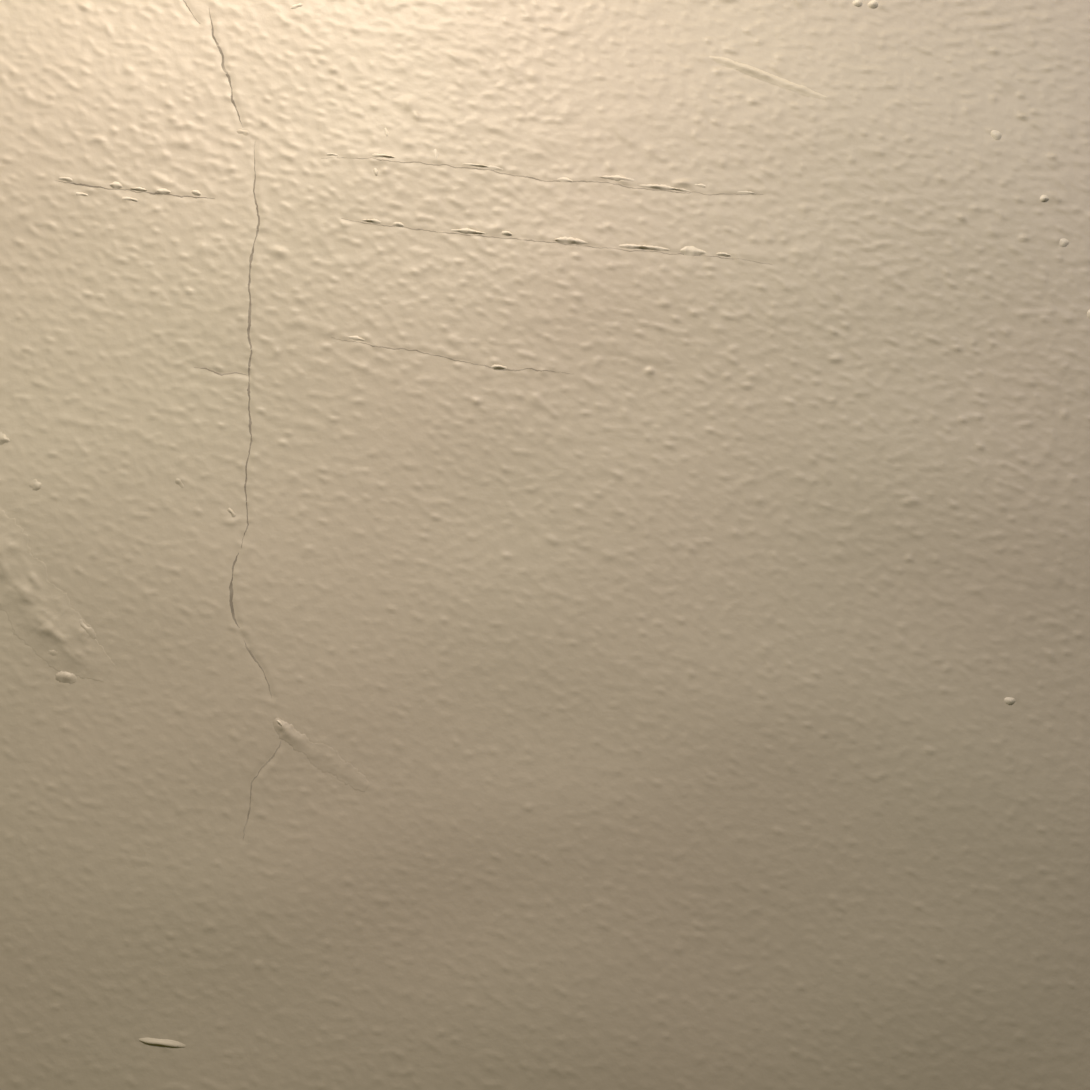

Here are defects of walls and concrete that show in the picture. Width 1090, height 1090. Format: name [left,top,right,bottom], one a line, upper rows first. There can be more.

crack [183,0,272,697]